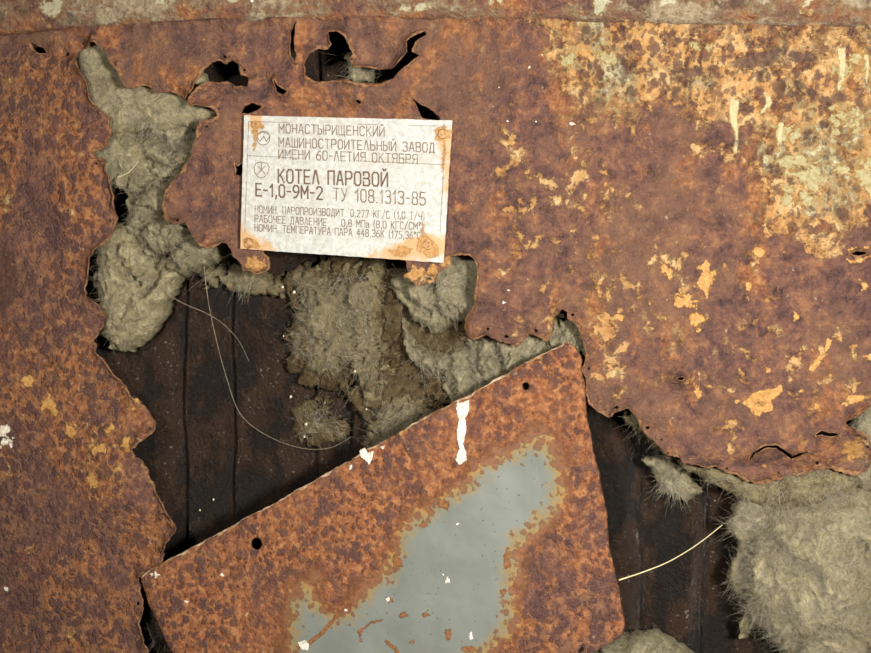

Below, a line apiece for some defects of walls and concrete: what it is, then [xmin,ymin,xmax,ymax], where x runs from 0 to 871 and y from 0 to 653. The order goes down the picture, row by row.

peeling [303,29,426,88]
rust [732,46,816,70]
peeling [828,105,865,138]
peeling [774,155,871,208]
rust [388,228,451,281]
rust [666,260,717,333]
peeling [65,38,270,653]
rust [809,338,832,372]
peeling [20,371,36,387]
peeling [40,393,58,416]
rust [734,385,783,420]
rust [841,394,865,407]